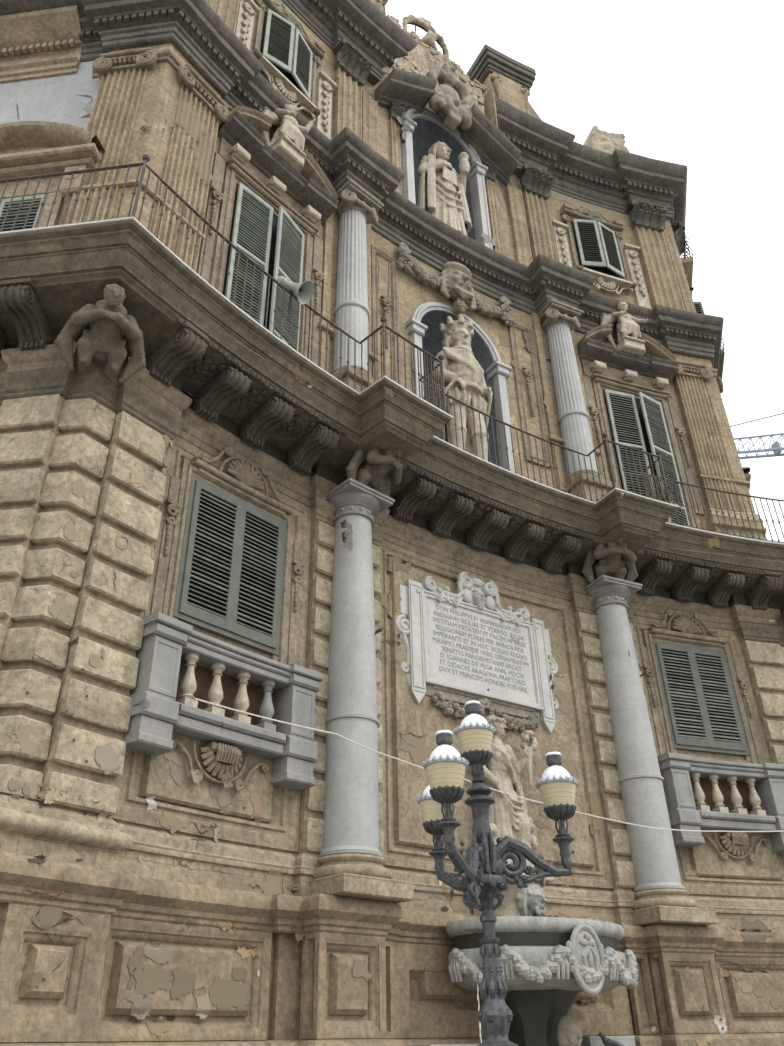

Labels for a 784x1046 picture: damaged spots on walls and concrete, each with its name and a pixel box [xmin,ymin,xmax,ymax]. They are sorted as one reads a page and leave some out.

peeling [195,993,212,1019]